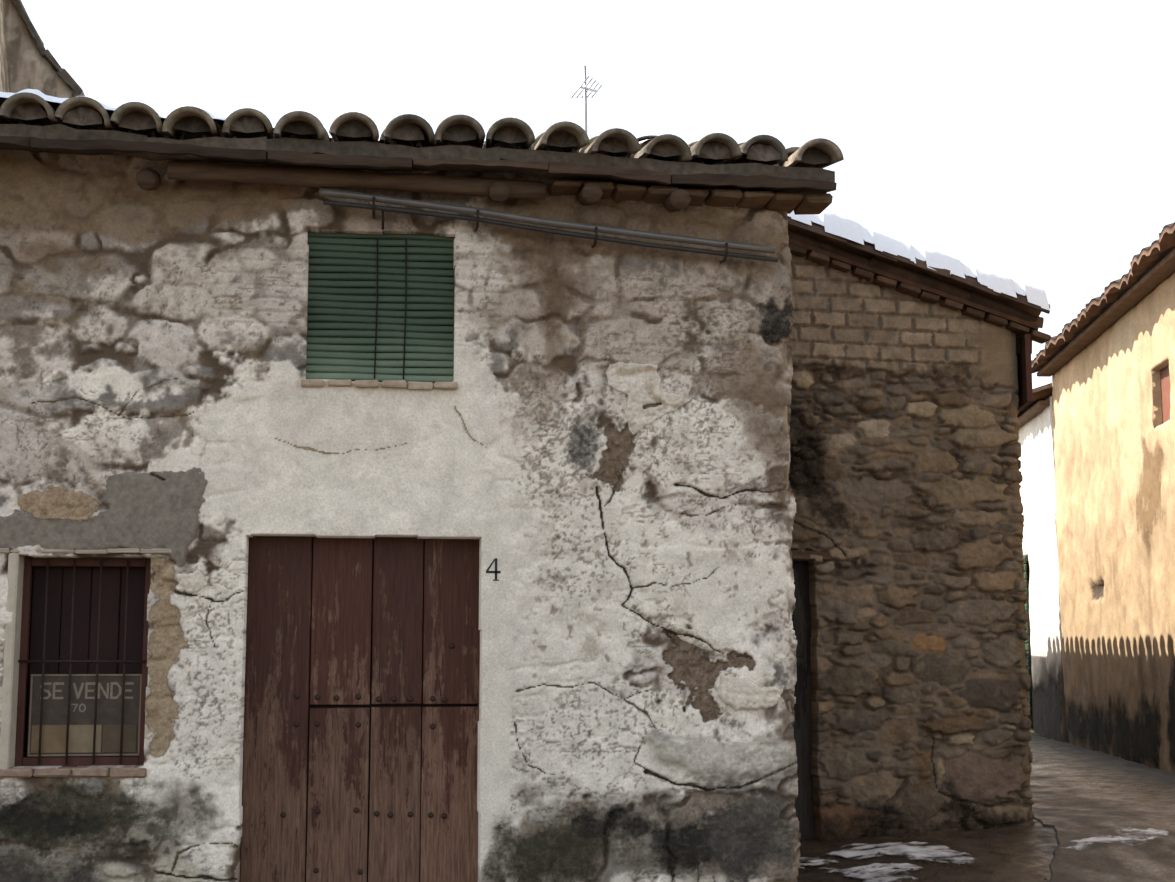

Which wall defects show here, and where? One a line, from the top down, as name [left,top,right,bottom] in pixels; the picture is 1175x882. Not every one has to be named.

flaking render [567,414,637,492]
peeling [18,485,99,521]
crack [674,483,782,517]
crack [596,471,719,629]
peeling [145,554,208,757]
flaking render [662,624,783,722]
crack [514,682,796,791]
water stain [486,822,511,882]
water stain [569,804,749,882]